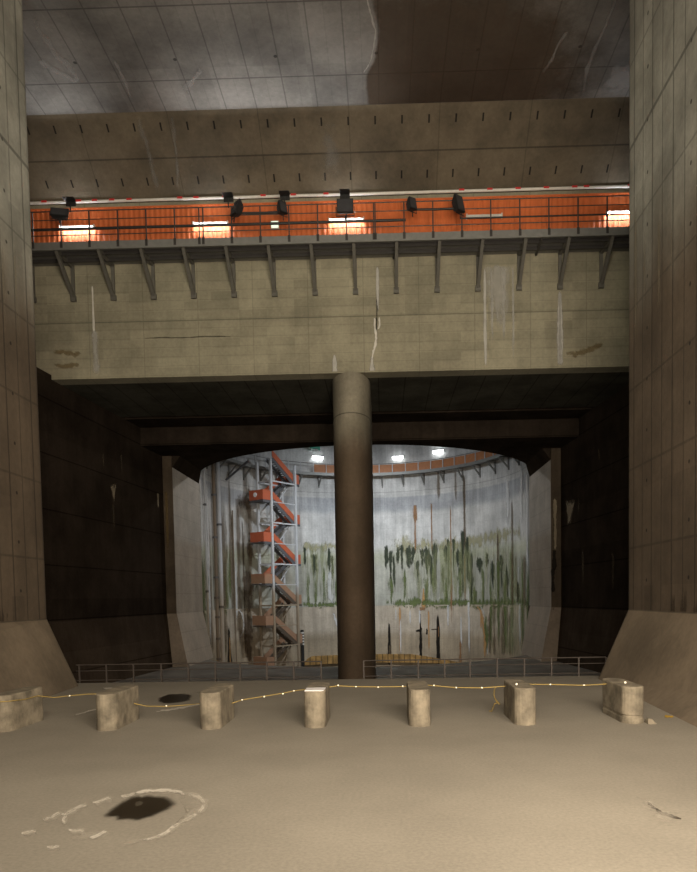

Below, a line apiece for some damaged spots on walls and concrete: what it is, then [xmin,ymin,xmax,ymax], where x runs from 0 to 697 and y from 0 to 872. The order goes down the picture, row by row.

crack [363,0,376,73]
crack [370,267,380,371]
leakage [43,788,206,840]